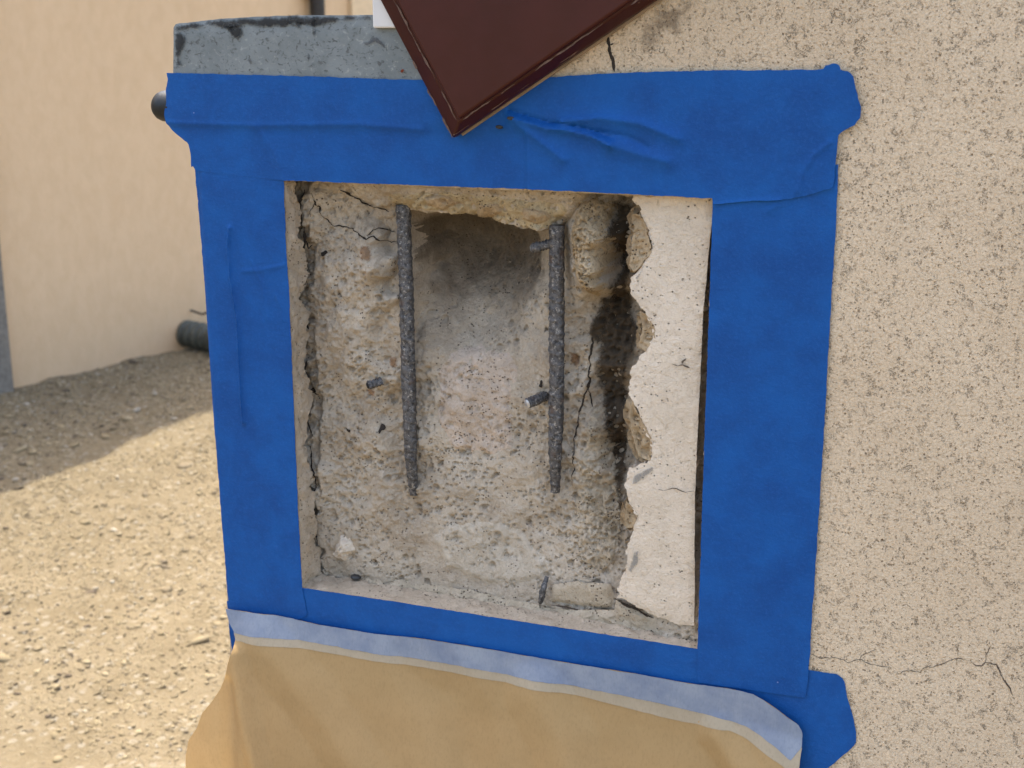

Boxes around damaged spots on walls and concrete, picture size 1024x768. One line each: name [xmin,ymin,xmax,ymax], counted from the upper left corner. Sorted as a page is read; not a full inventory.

crack [298,189,395,249]
spalling [626,205,653,273]
spalling [388,191,567,496]
leakage [589,294,619,342]
spalling [636,309,655,351]
crack [571,337,594,486]
spalling [623,398,652,463]
spalling [620,497,638,530]
crack [812,644,1012,694]